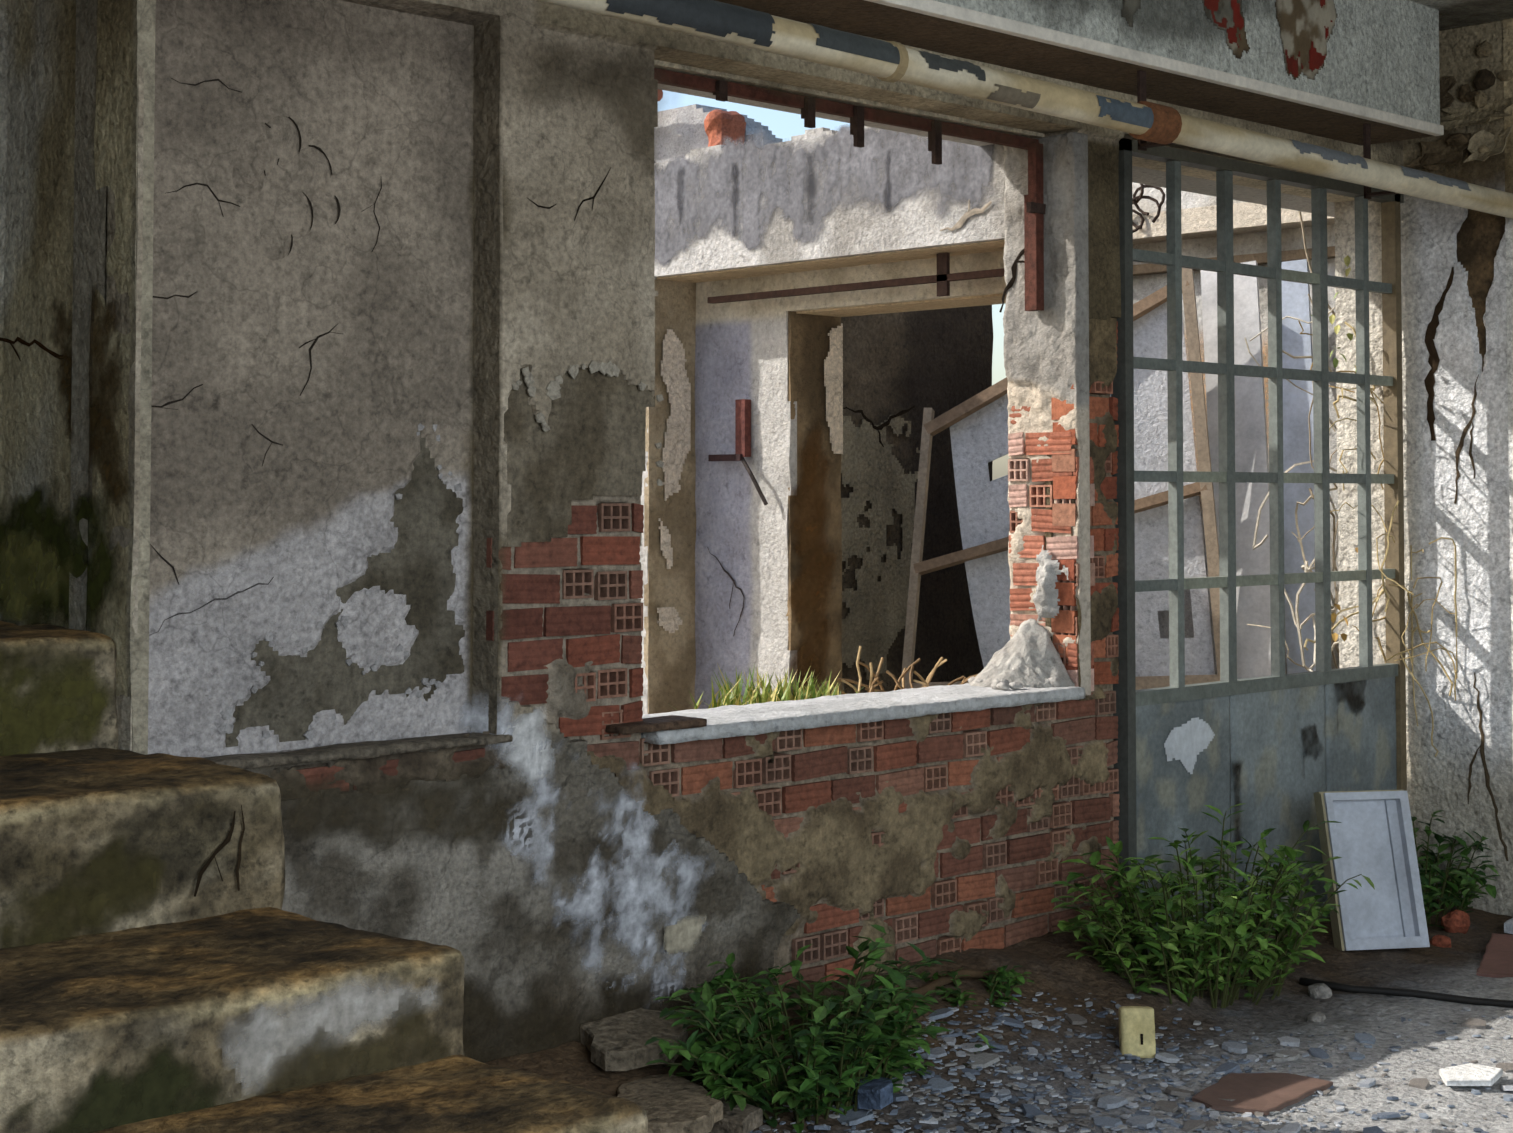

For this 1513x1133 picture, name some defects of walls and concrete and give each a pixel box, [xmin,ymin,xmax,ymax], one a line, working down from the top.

peeling [606,0,776,47]
peeling [810,23,900,64]
peeling [1275,0,1338,80]
crack [167,183,240,217]
crack [153,291,198,299]
crack [0,336,61,361]
crack [299,325,341,396]
crack [1424,267,1479,504]
flaking render [217,423,465,747]
flaking render [486,317,1120,985]
damp [278,703,558,880]
damp [228,795,757,1095]